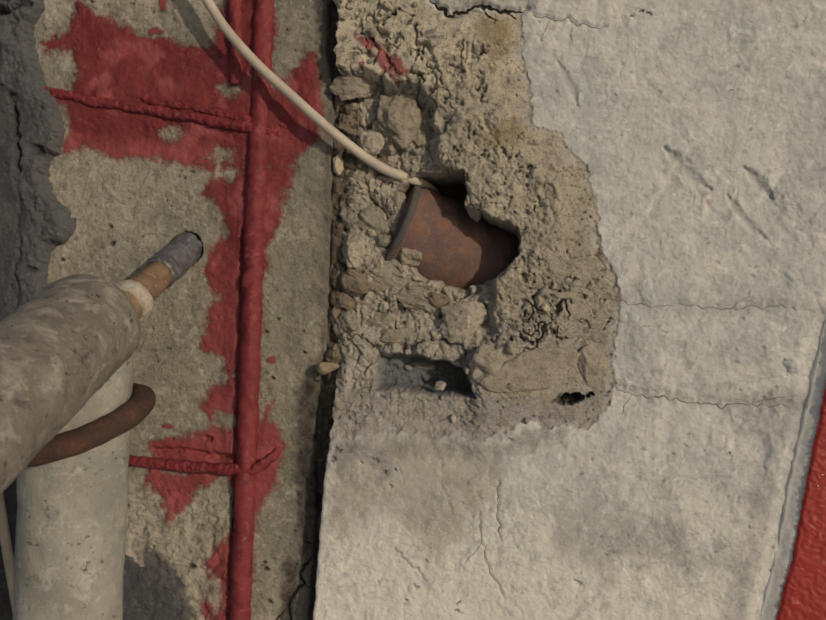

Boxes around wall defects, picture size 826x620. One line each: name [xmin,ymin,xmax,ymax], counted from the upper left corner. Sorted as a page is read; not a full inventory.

peeling [41,0,320,620]
crack [275,2,358,620]
spalling [282,0,622,443]
crack [430,0,604,40]
crack [577,286,810,310]
crack [613,384,791,414]